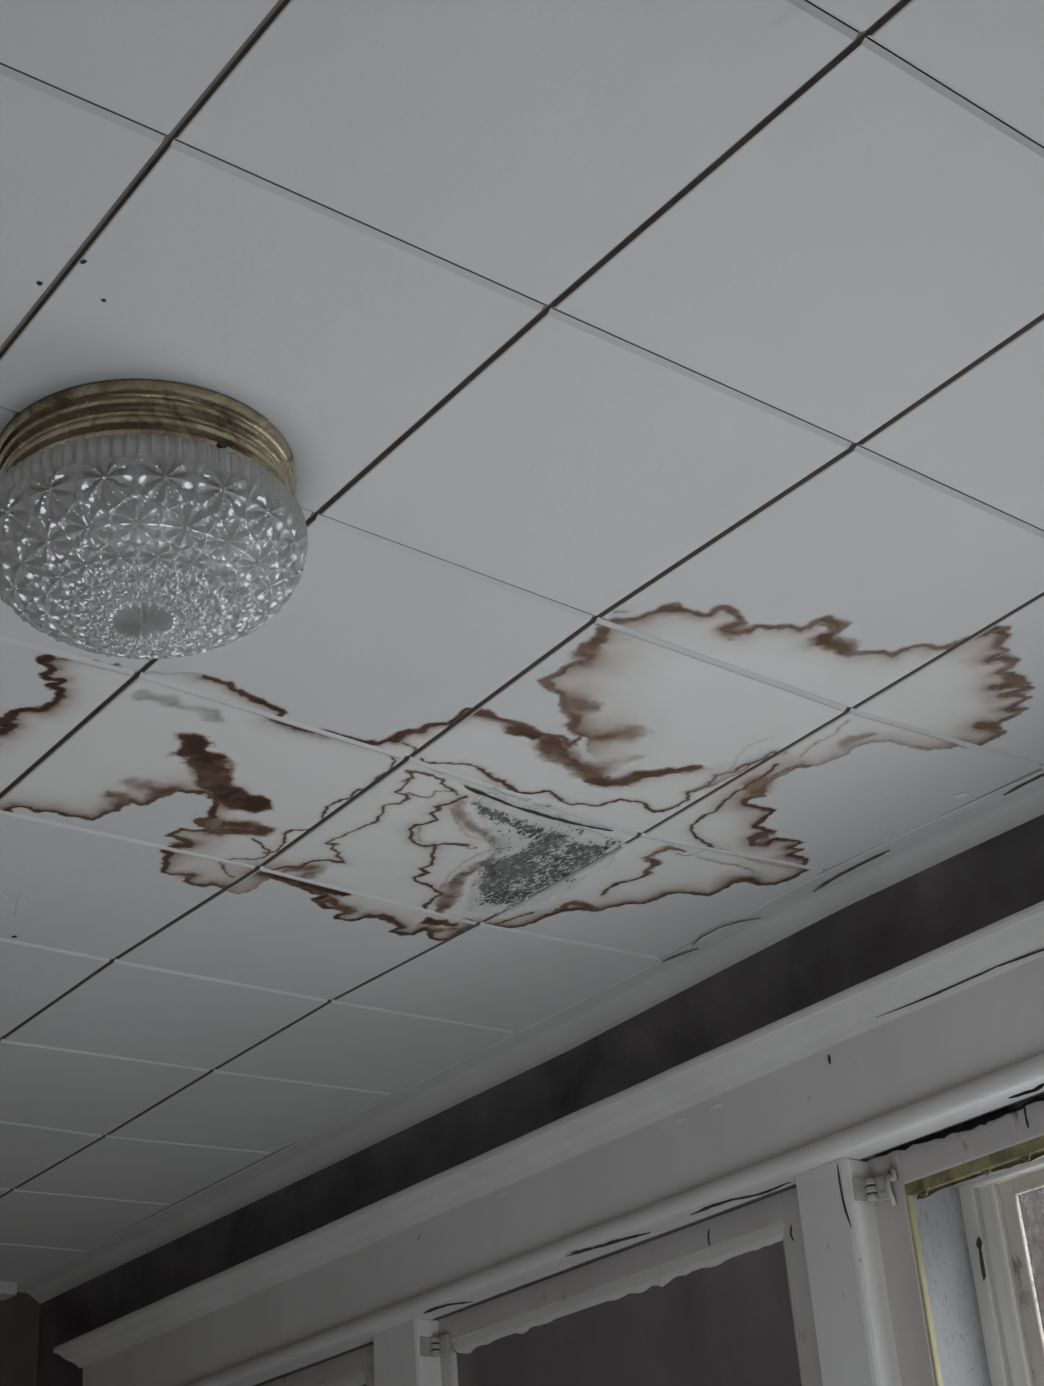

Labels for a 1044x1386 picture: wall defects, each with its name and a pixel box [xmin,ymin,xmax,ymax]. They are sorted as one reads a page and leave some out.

water stain [0,603,1034,941]